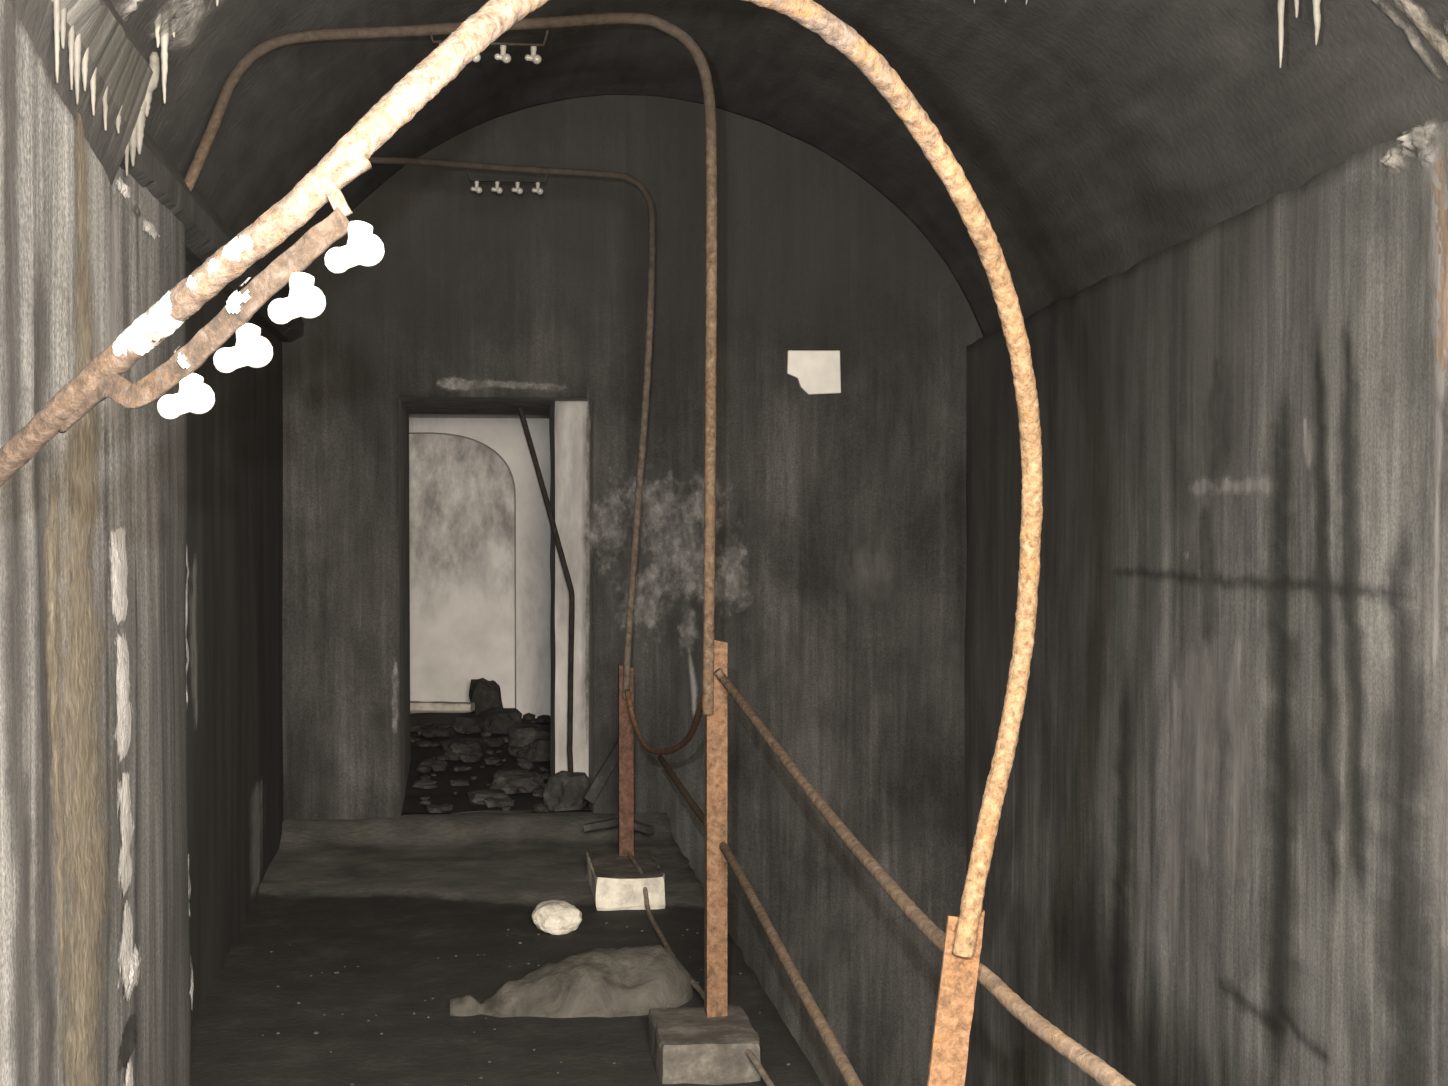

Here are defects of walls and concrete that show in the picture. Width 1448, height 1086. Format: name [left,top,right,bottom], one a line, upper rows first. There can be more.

water stain [1371,0,1448,80]
corrosion [1427,146,1448,667]
peeling [109,525,141,1086]
water stain [1164,636,1253,966]
water stain [1438,684,1448,946]